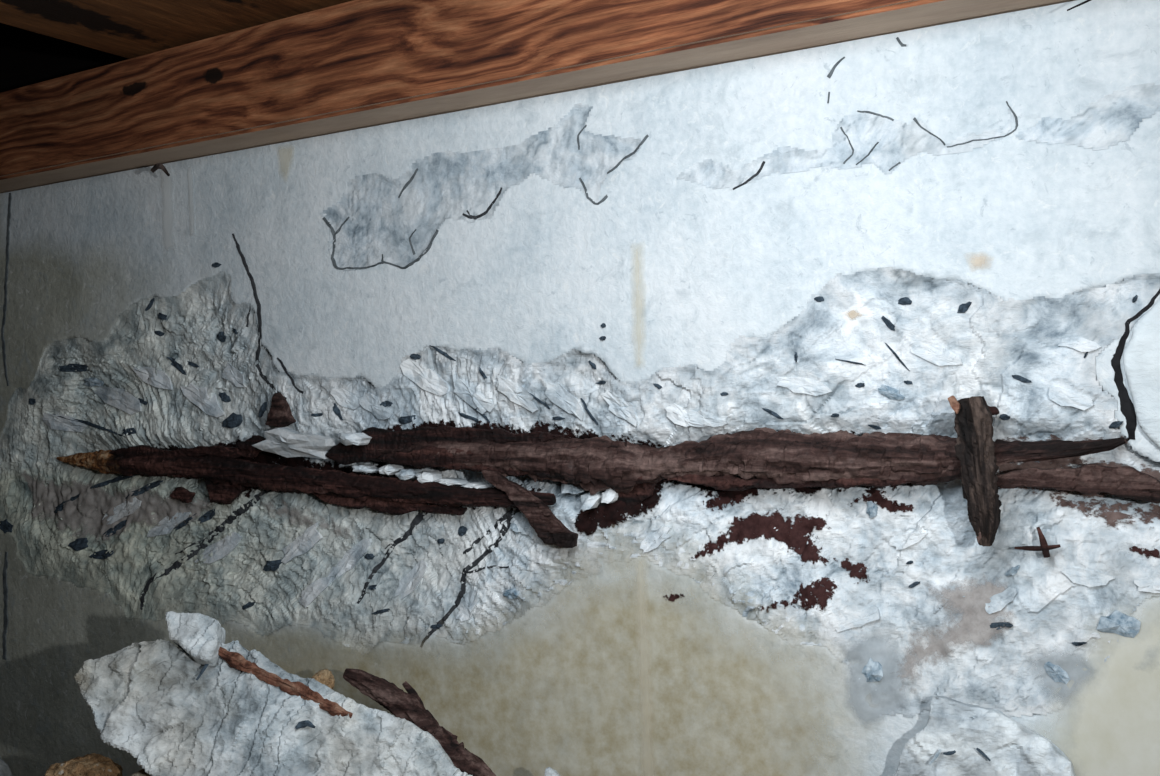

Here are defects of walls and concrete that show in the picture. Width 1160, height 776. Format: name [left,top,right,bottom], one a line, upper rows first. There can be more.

crack [827,57,1018,171]
peeling [320,103,641,271]
crack [232,233,304,399]
crack [420,507,520,648]
corrosion [387,419,664,448]
spalling [0,262,1160,718]
corrosion [574,479,913,613]
corrosion [1019,486,1160,529]
corrosion [1119,546,1160,558]
leakage [279,577,822,776]
leakage [848,637,904,721]
leakage [1035,608,1160,776]